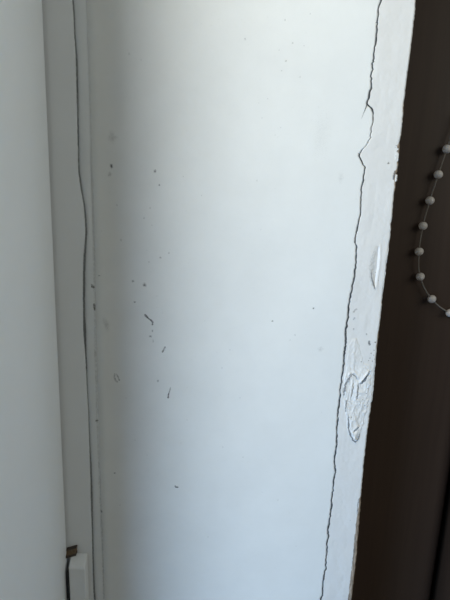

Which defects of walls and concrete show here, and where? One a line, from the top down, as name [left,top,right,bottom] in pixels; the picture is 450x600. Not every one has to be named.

crack [364,0,382,139]
crack [320,151,366,600]
peeling [343,338,376,444]